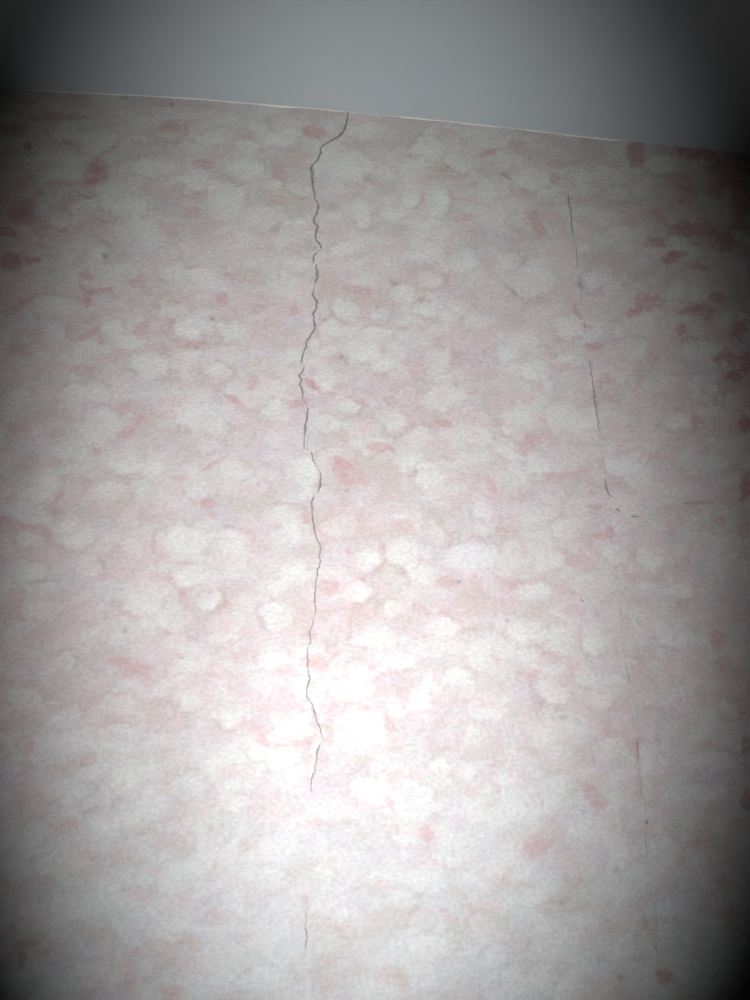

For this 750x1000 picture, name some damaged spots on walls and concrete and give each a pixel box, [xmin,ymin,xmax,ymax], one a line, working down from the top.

crack [298,114,348,612]